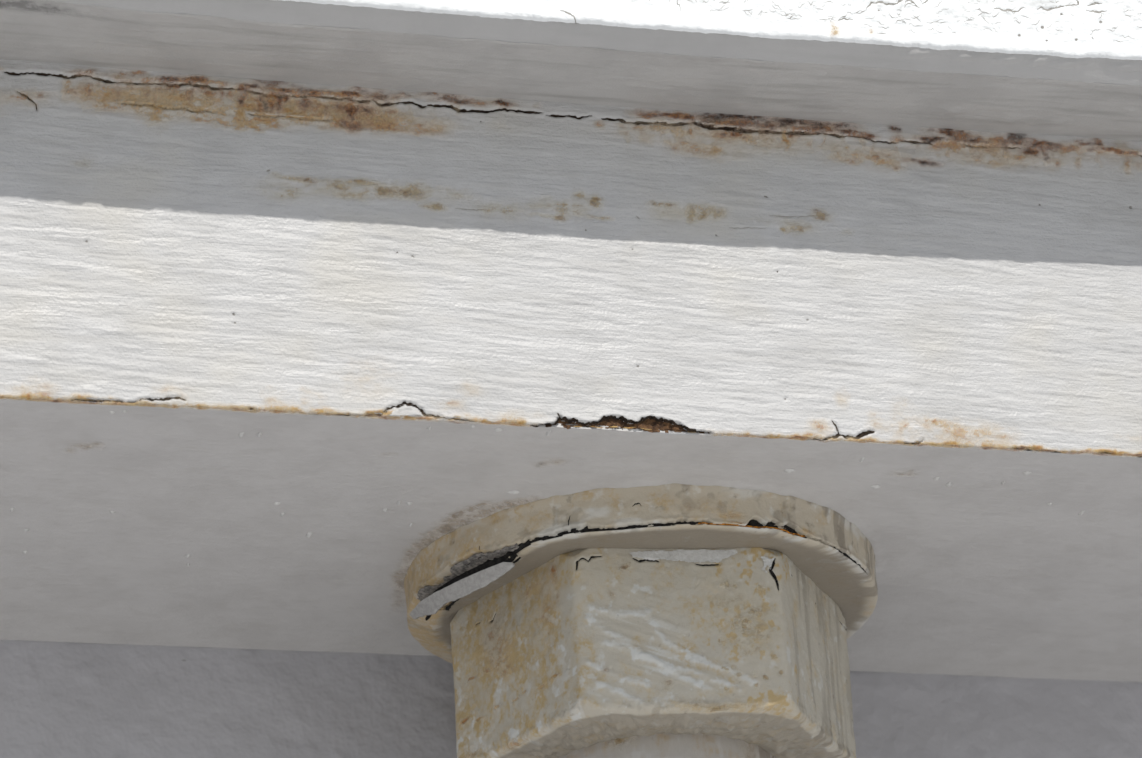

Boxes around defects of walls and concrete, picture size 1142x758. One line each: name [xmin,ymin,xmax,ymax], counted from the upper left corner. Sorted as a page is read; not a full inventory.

crack [677,0,1142,42]
corrosion [67,70,427,133]
crack [4,72,933,145]
corrosion [634,111,875,163]
corrosion [912,128,1138,166]
corrosion [0,392,433,420]
crack [315,401,474,422]
spalling [530,413,710,434]
crack [807,421,875,441]
corrosion [714,419,1142,457]
crack [417,503,866,621]
peeling [410,562,515,619]